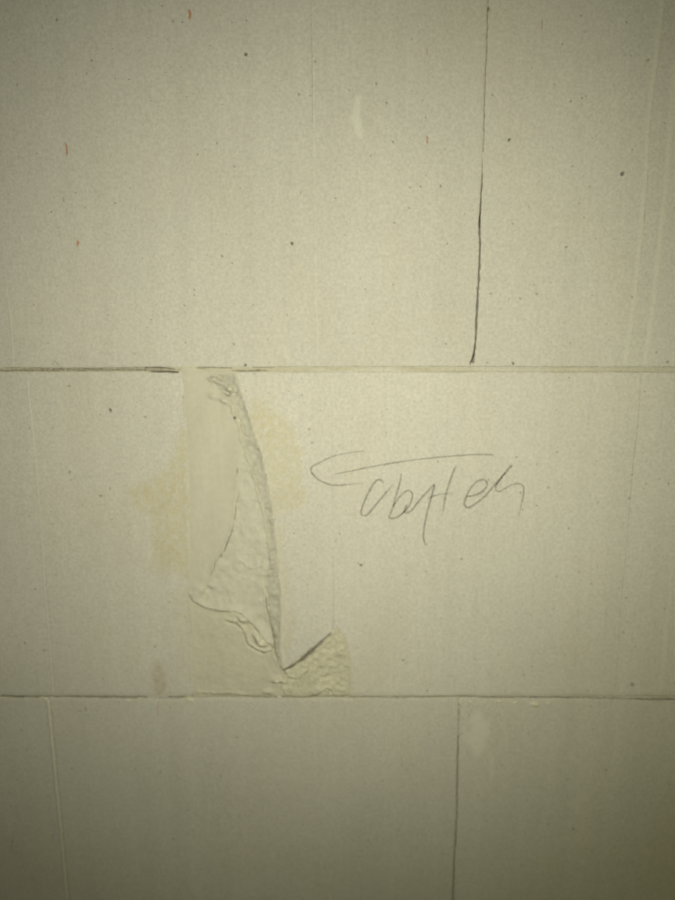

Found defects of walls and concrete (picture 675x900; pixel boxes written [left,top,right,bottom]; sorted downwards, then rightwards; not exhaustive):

spalling [281,625,351,698]